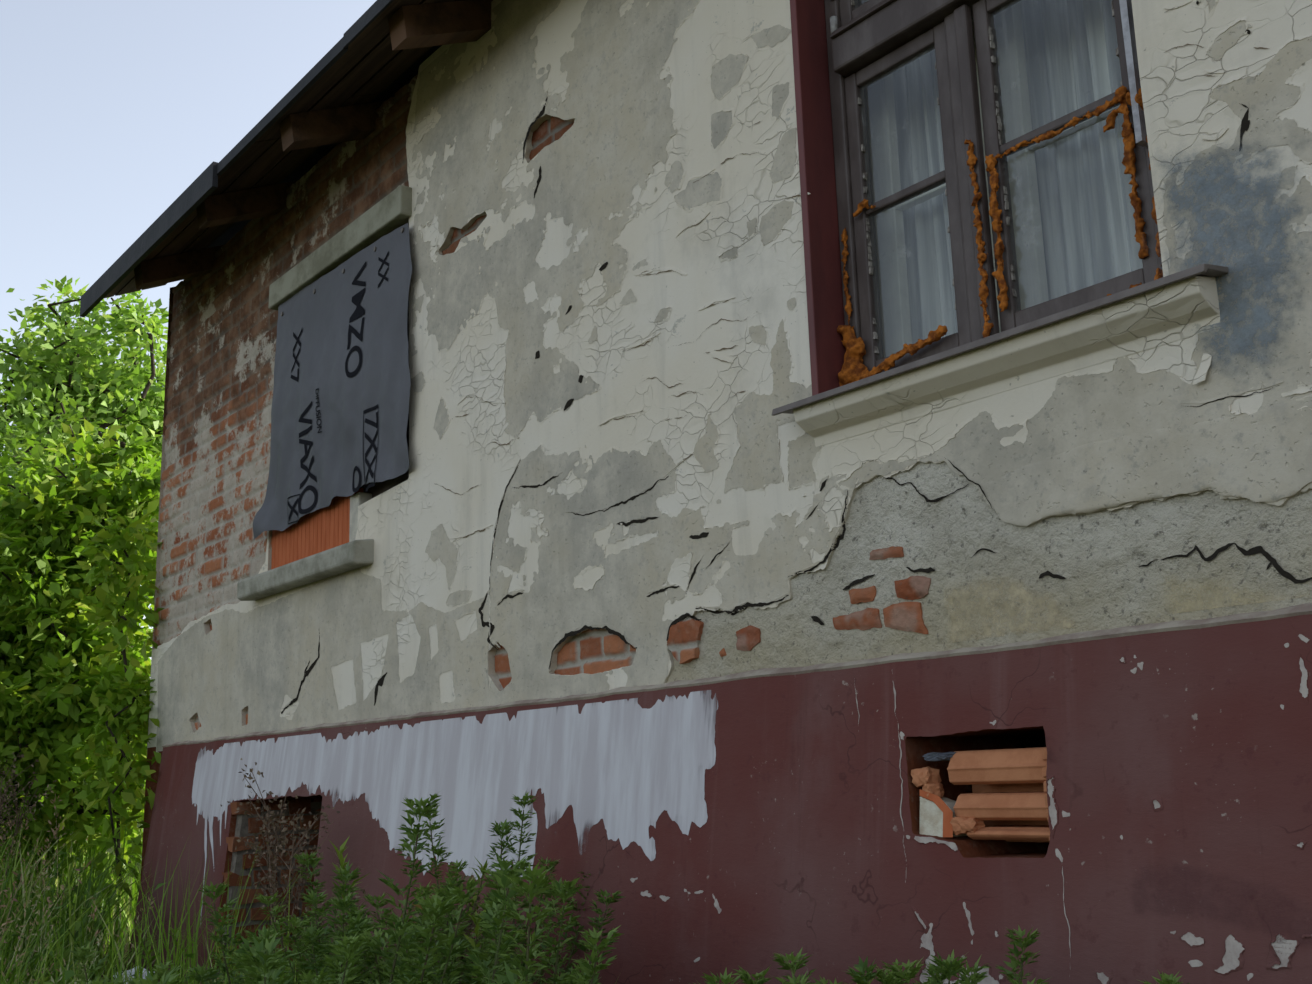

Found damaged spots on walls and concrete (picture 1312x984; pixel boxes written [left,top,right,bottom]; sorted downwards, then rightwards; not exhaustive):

crack [1202,103,1250,152]
leakage [1169,156,1298,363]
flaking render [154,0,1312,753]
crack [565,452,694,526]
crack [884,457,996,513]
crack [441,437,562,650]
crack [549,475,848,668]
crack [1139,543,1312,584]
crack [281,626,320,714]
peeling [904,832,958,852]
peeling [911,902,1009,984]
peeling [1170,931,1300,981]